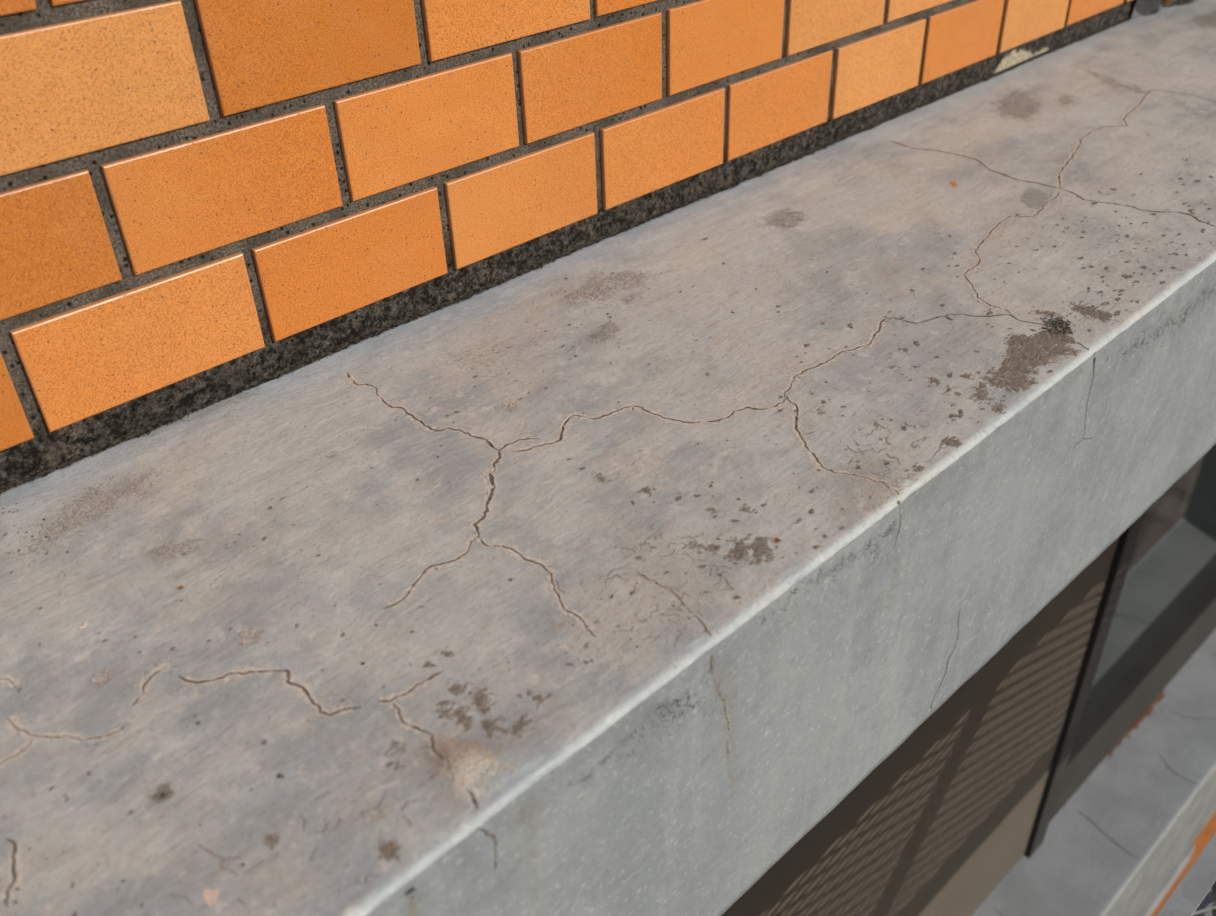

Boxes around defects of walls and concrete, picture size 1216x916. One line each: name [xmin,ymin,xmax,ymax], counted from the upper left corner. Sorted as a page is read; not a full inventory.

peeling [887,168,1214,449]
crack [339,90,1216,758]
crack [0,825,37,908]
crack [198,844,264,907]
crack [0,654,499,870]